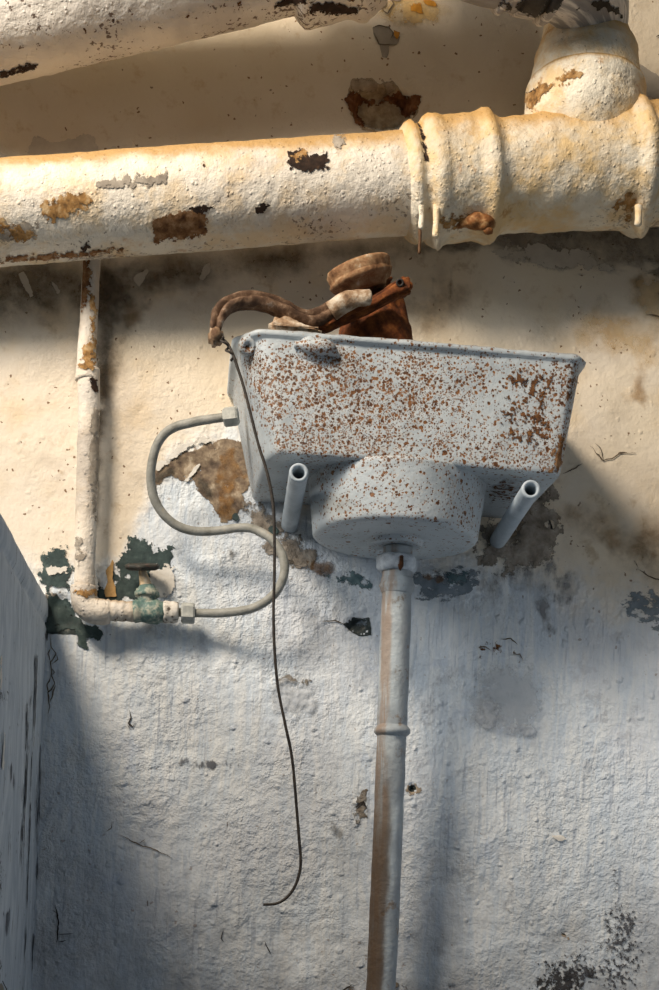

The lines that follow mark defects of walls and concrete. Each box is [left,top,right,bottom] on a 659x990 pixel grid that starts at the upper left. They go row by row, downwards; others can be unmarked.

flaking render [344,78,429,161]
peeling [37,545,111,650]
peeling [95,535,177,601]
peeling [155,436,373,589]
peeling [413,484,564,602]
mould [529,868,650,990]